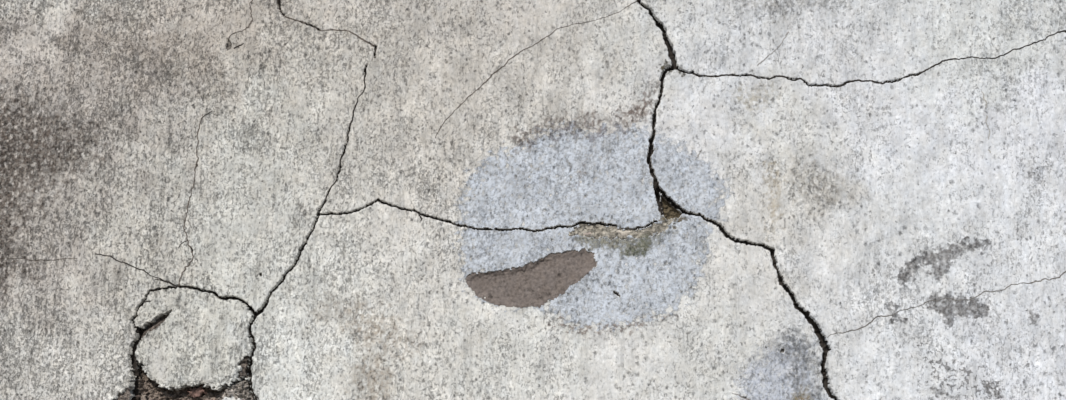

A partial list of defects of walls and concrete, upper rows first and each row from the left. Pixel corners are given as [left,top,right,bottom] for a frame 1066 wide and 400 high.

crack [228,0,253,49]
crack [277,0,377,58]
crack [435,0,1066,400]
crack [0,255,77,263]
crack [95,65,666,400]
peeling [452,121,729,339]
spalling [142,314,170,338]
spalling [114,356,259,400]